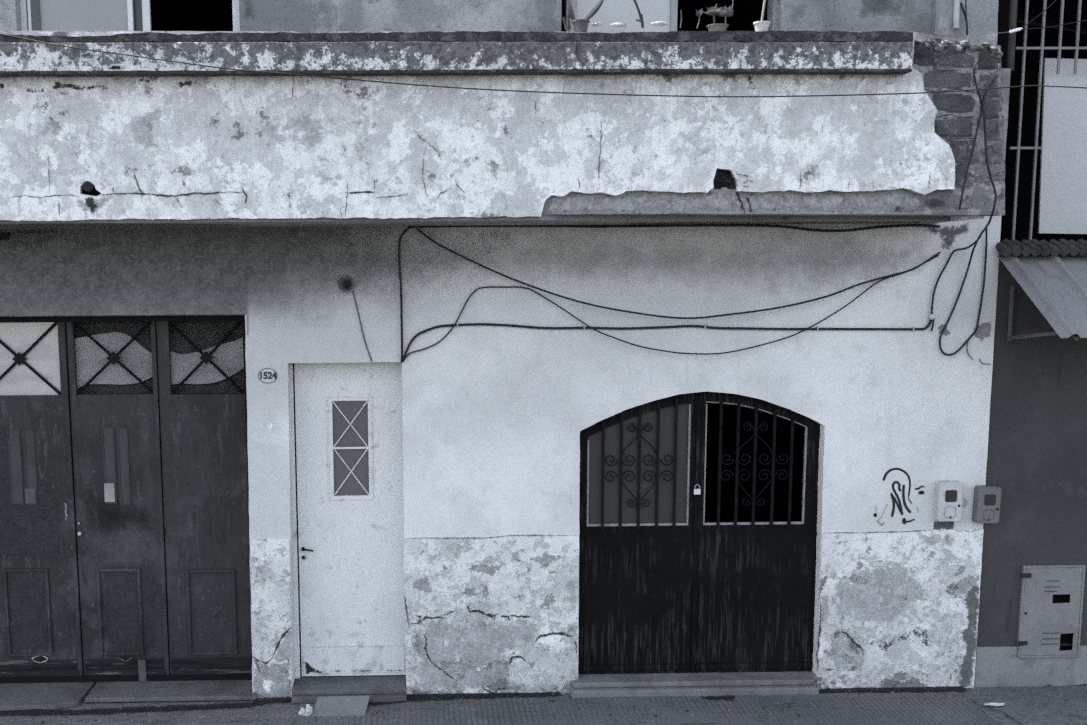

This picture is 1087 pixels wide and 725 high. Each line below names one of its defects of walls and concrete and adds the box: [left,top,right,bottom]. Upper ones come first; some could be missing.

peeling [131,110,161,148]
peeling [263,114,322,146]
spalling [547,38,1006,214]
peeling [413,578,432,593]
peeling [444,564,501,597]
peeling [513,549,561,579]
peeling [819,521,955,672]
crack [253,627,291,672]
peeling [412,604,537,694]
crack [405,598,577,693]
peeling [254,662,291,698]
spalling [880,677,926,688]